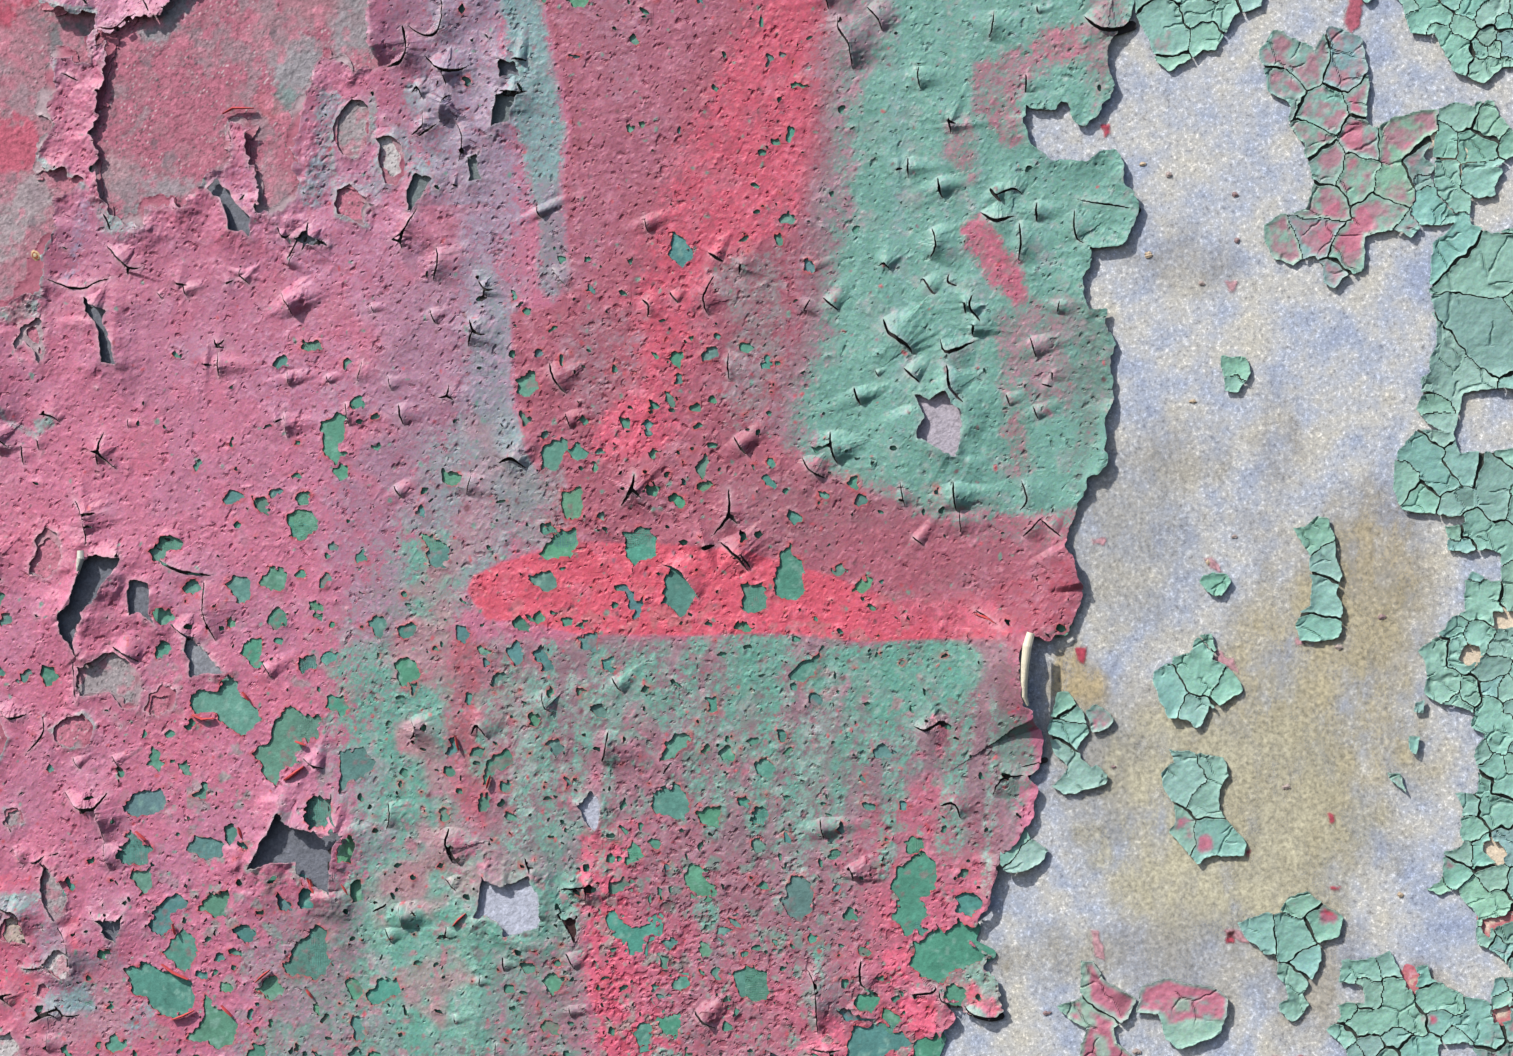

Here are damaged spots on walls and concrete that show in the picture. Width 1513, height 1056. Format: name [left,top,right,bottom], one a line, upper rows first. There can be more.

crack [1085,17,1136,35]
crack [1363,0,1513,83]
peeling [0,0,414,427]
peeling [223,566,289,669]
peeling [223,488,339,628]
peeling [734,509,806,633]
flaking render [831,0,1513,1056]
crack [1326,175,1513,1056]
peeling [0,607,349,1056]
peeling [303,747,376,902]
peeling [651,729,793,853]
peeling [605,841,772,1056]